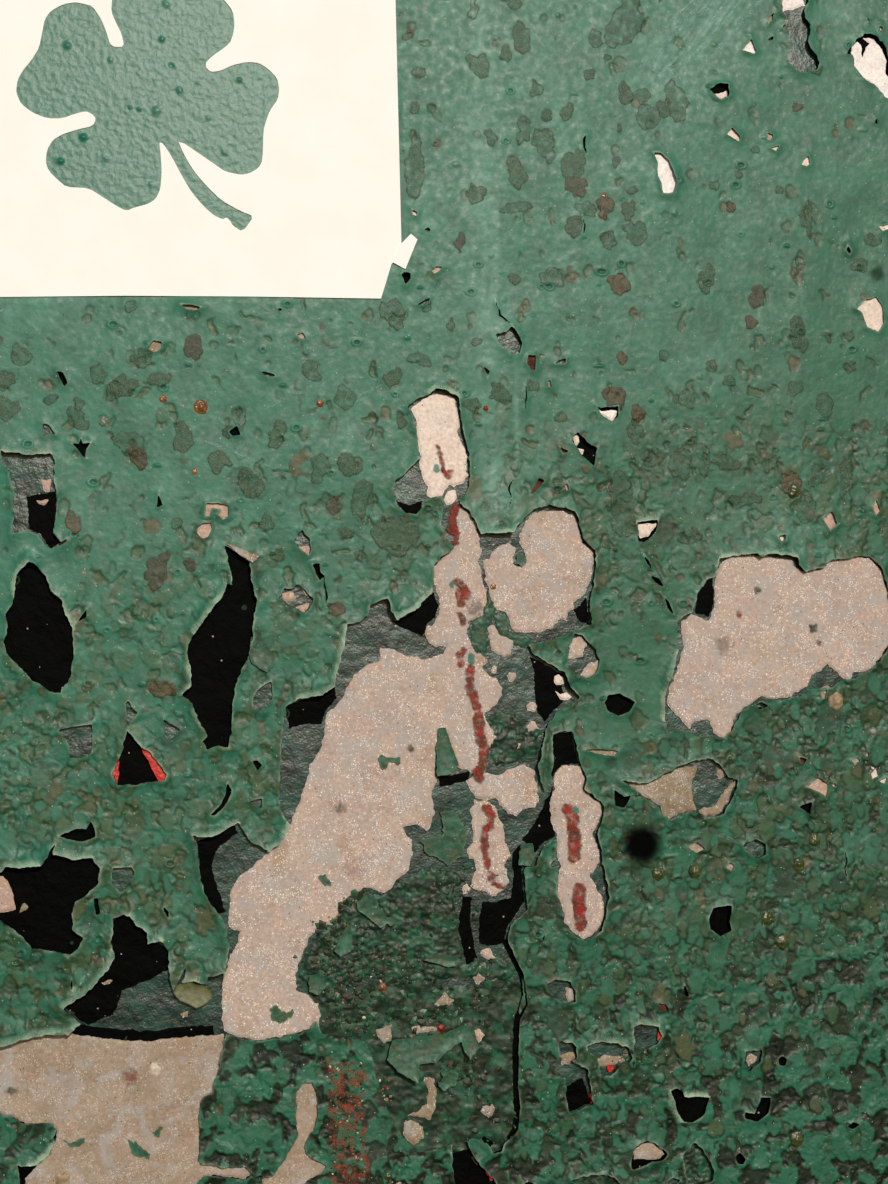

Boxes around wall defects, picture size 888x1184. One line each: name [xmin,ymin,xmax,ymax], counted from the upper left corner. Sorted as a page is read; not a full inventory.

peeling [847,19,888,98]
rust [436,445,452,479]
rust [447,502,461,545]
rust [453,579,470,625]
peeling [661,535,888,737]
rust [456,647,489,783]
peeling [0,385,620,1184]
peeling [624,759,738,819]
rust [481,805,505,889]
rust [562,804,582,863]
rust [572,883,588,931]
rust [328,1062,369,1184]